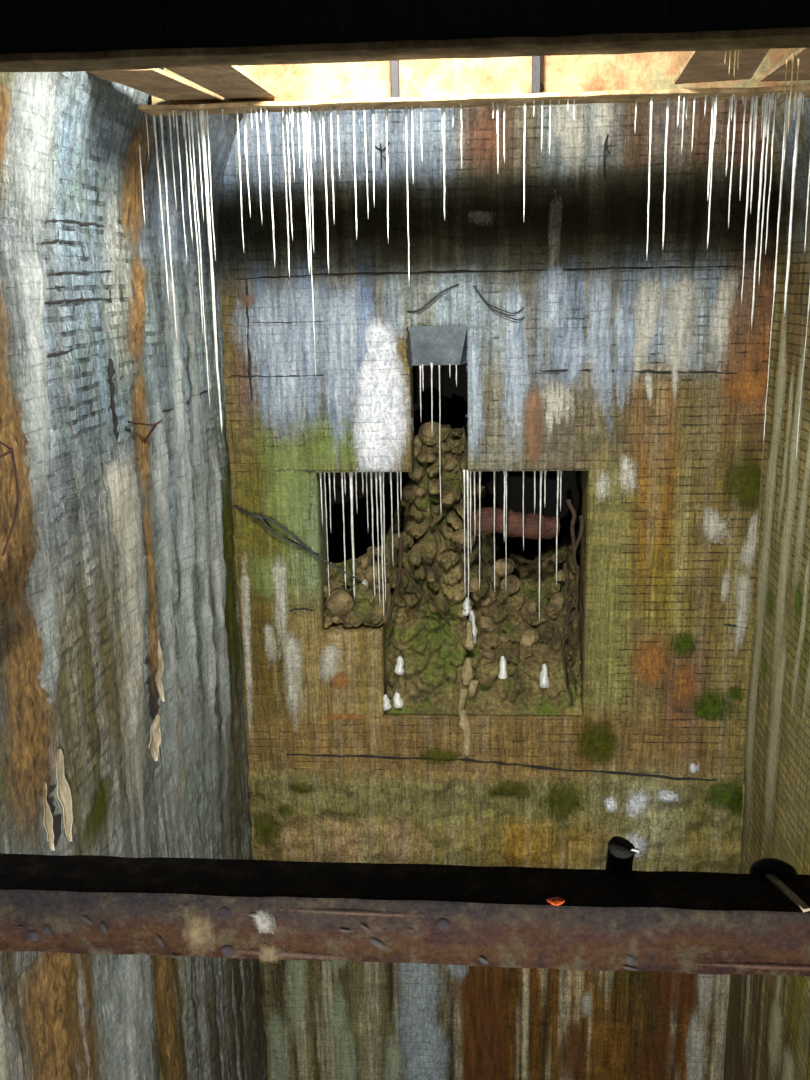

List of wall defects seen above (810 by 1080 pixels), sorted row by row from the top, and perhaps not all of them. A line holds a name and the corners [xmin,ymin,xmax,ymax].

rust [0,83,11,164]
water stain [152,112,280,246]
water stain [294,108,436,175]
water stain [234,284,406,532]
water stain [545,278,697,432]
rust [0,297,57,831]
water stain [722,314,810,814]
peeling [43,749,73,851]
crack [286,754,718,781]
rust [28,952,79,1080]
rust [455,965,508,1080]
rust [636,971,699,1080]